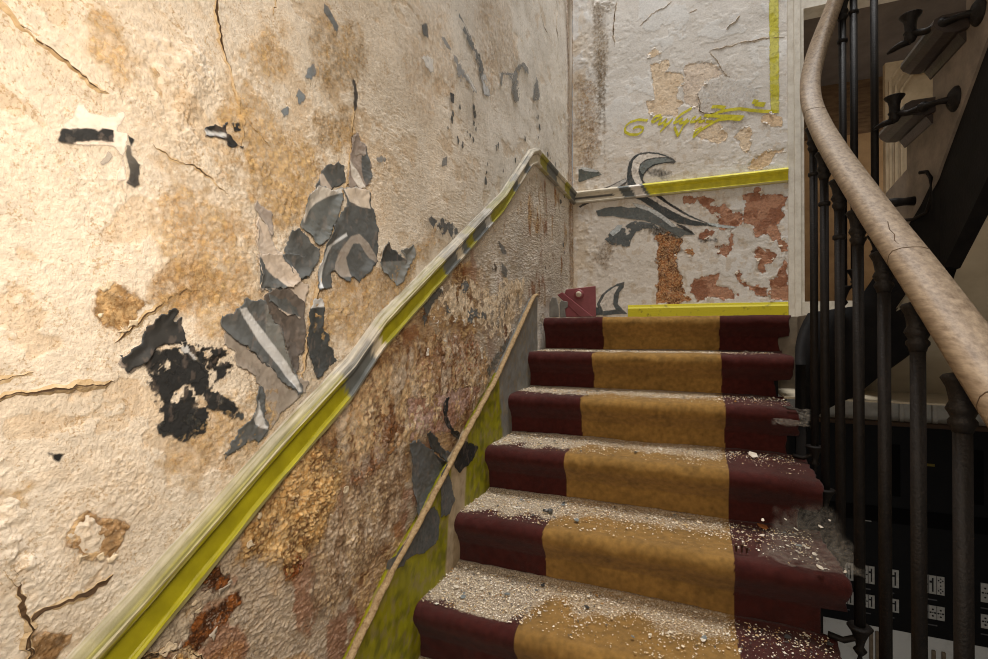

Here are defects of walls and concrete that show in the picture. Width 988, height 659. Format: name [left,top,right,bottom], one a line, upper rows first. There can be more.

crack [0,0,109,94]
crack [213,0,269,146]
peeling [58,104,140,187]
water stain [220,95,356,225]
water stain [152,187,251,337]
peeling [94,133,416,460]
flaking render [654,187,788,304]
crack [0,371,114,402]
flaking render [235,241,526,625]
crack [3,567,113,659]
rust [176,566,242,652]
rust [283,553,304,582]